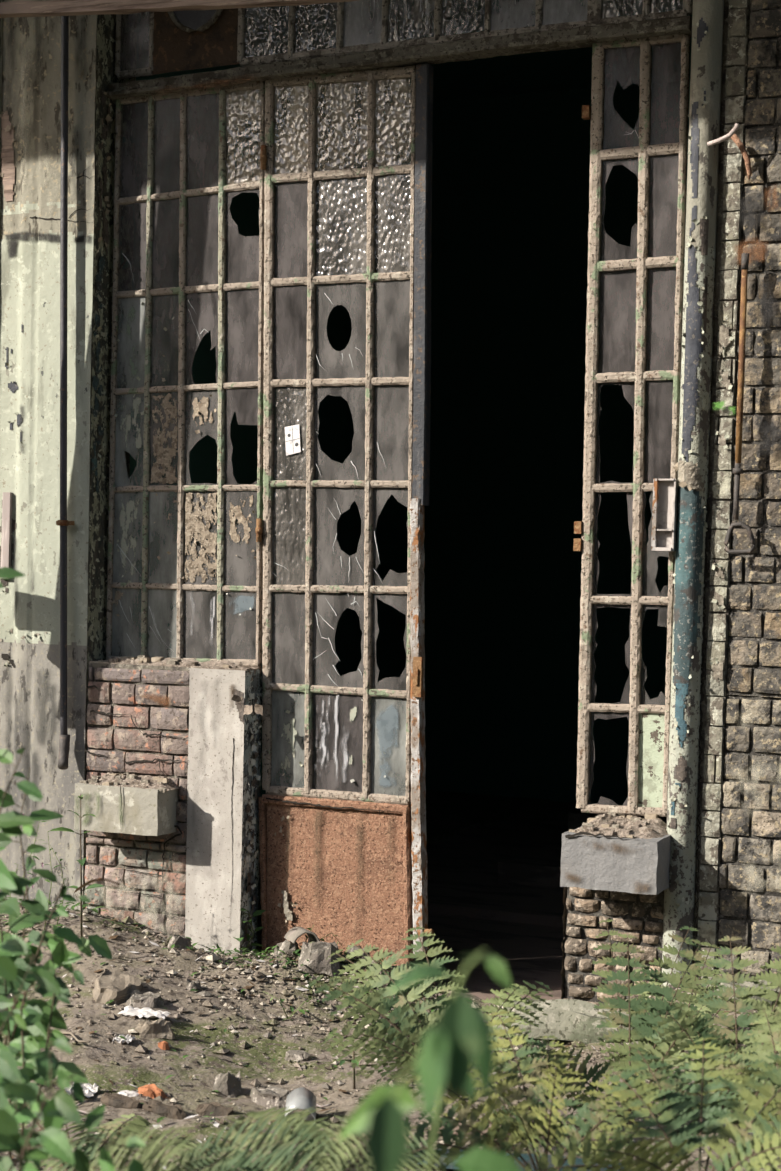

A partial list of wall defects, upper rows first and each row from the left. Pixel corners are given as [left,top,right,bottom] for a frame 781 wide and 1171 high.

peeling [231,689,263,942]
peeling [668,87,733,829]